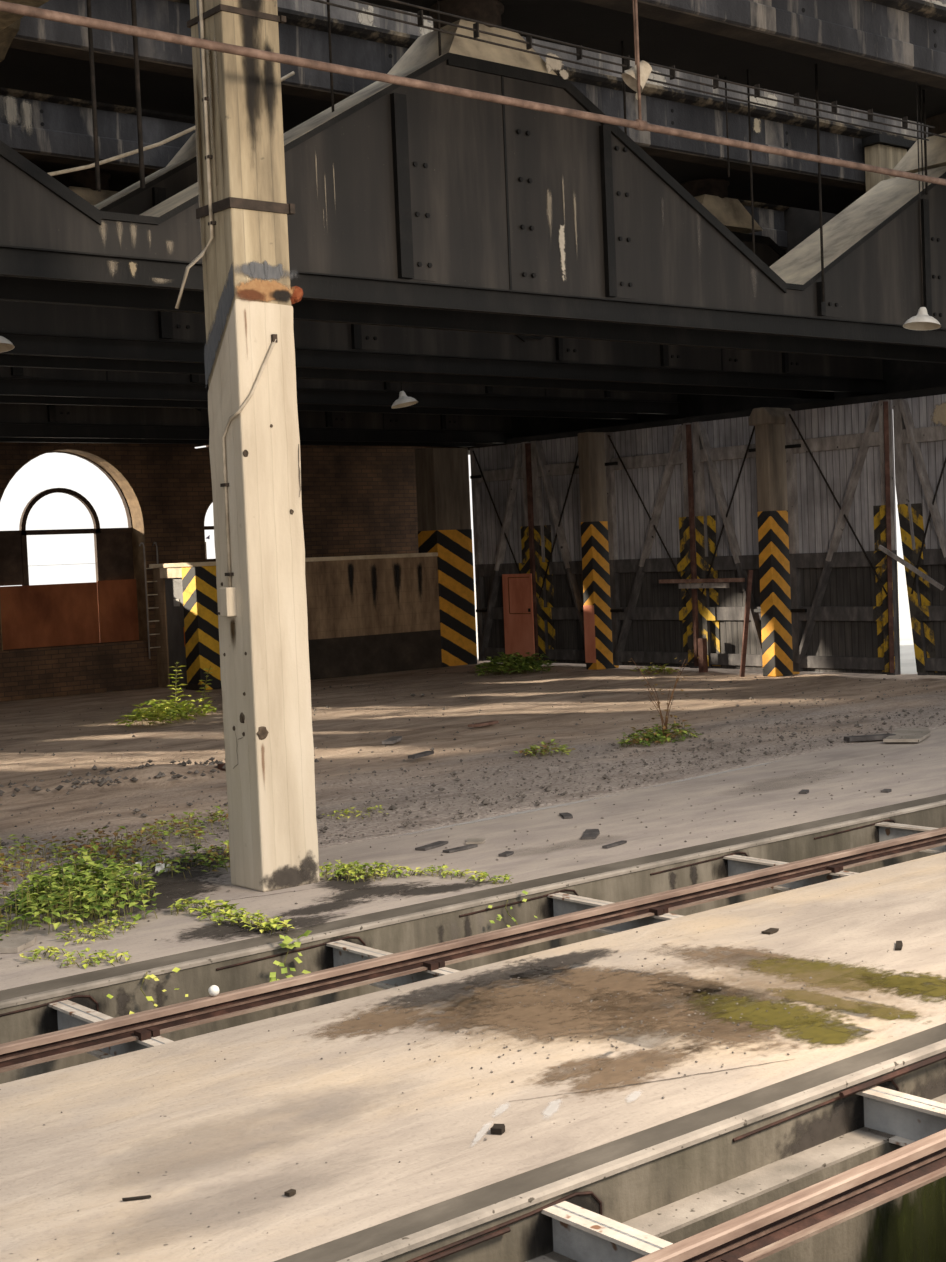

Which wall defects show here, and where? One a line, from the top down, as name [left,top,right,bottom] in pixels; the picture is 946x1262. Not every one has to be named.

leakage [240,0,276,137]
peeling [546,53,568,79]
peeling [646,70,671,88]
leakage [538,1046,700,1093]